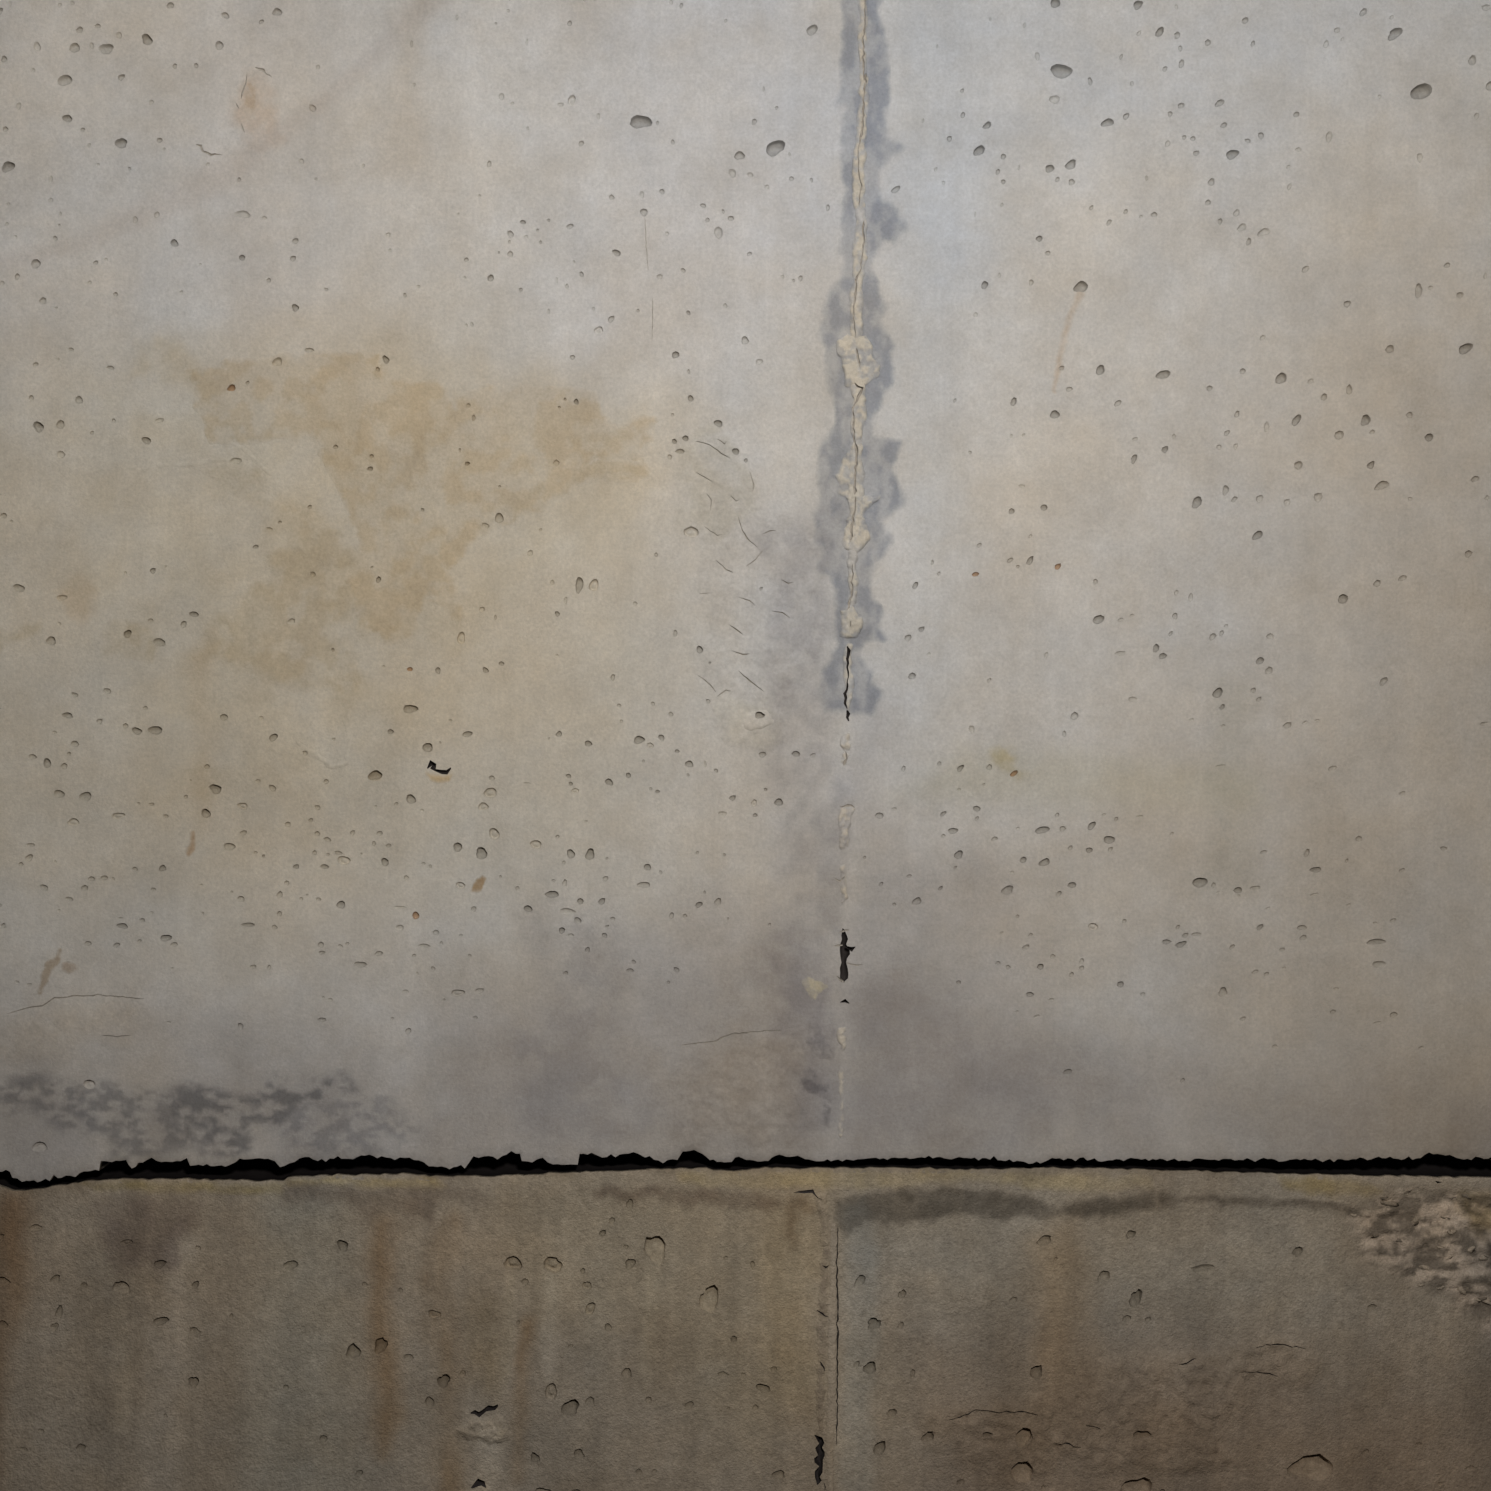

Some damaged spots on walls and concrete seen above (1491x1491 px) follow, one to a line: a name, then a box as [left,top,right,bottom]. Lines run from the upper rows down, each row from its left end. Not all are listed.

crack [843,0,867,766]
leakage [486,0,1385,1253]
crack [835,928,863,1004]
crack [0,1150,1491,1199]
leakage [0,1061,495,1491]
crack [471,1479,486,1489]
crack [471,1404,498,1417]
leakage [466,1440,508,1491]
leakage [500,1255,665,1405]
crack [814,1229,839,1488]
crack [1252,1343,1302,1376]
spalling [1337,1179,1491,1352]